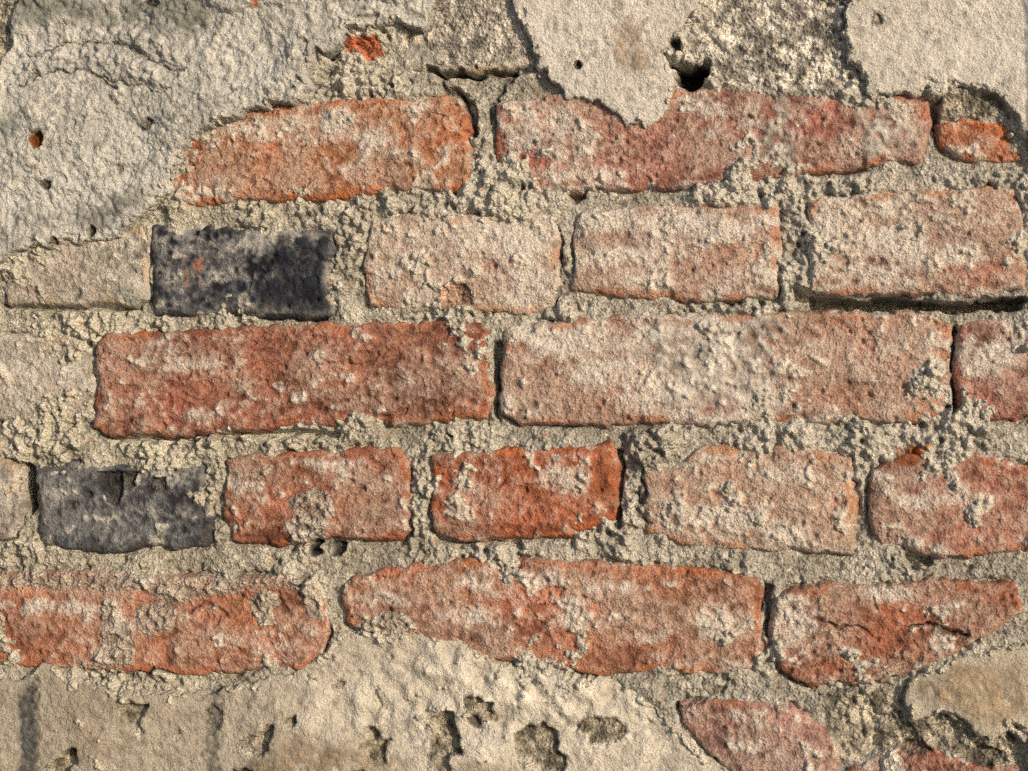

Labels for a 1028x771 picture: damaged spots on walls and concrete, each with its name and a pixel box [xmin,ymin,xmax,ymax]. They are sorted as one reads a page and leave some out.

peeling [0,0,1028,264]
spalling [435,281,473,312]
spalling [97,469,167,508]
spalling [309,538,348,557]
crack [823,620,873,637]
crack [907,621,971,639]
peeling [0,629,729,771]
spalling [821,642,1028,771]